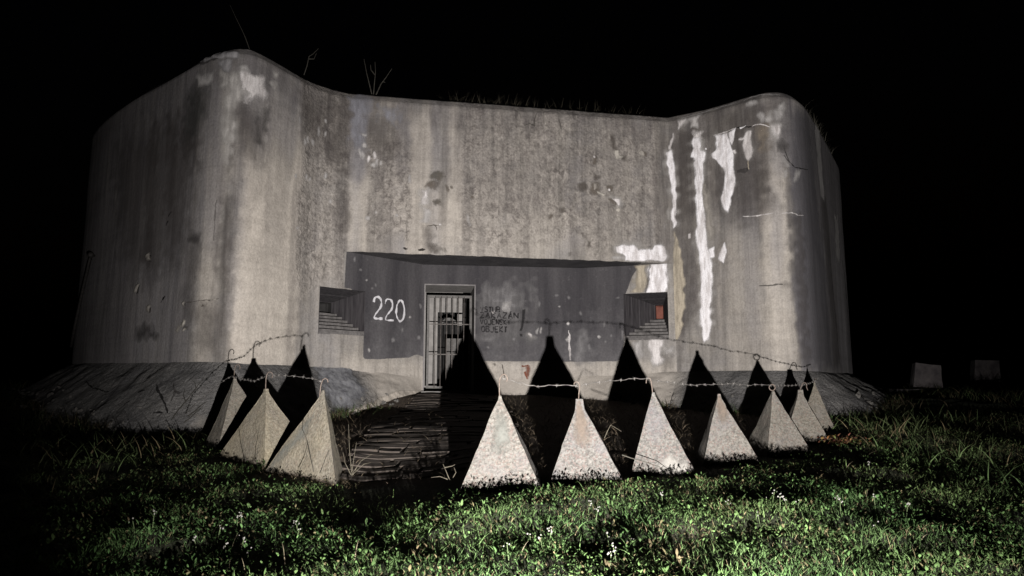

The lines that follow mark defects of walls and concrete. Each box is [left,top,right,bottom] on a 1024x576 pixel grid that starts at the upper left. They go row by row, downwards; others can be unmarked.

water stain [198,66,278,160]
crack [717,124,770,135]